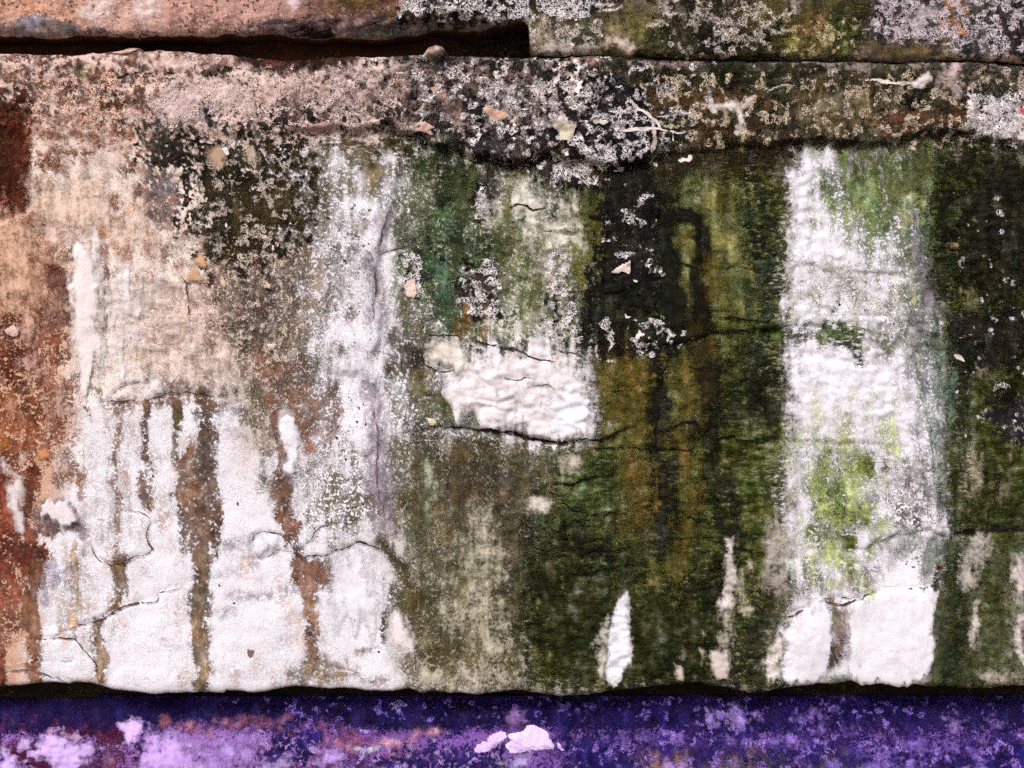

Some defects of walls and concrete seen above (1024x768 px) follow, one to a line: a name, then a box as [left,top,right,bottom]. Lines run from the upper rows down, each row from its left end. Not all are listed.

water stain [393,131,470,363]
crack [508,203,566,232]
crack [419,306,811,459]
corrosion [0,295,91,687]
crack [91,510,153,566]
corrosion [300,432,317,455]
water stain [0,170,1024,741]
crack [3,587,180,684]
crack [675,640,732,648]